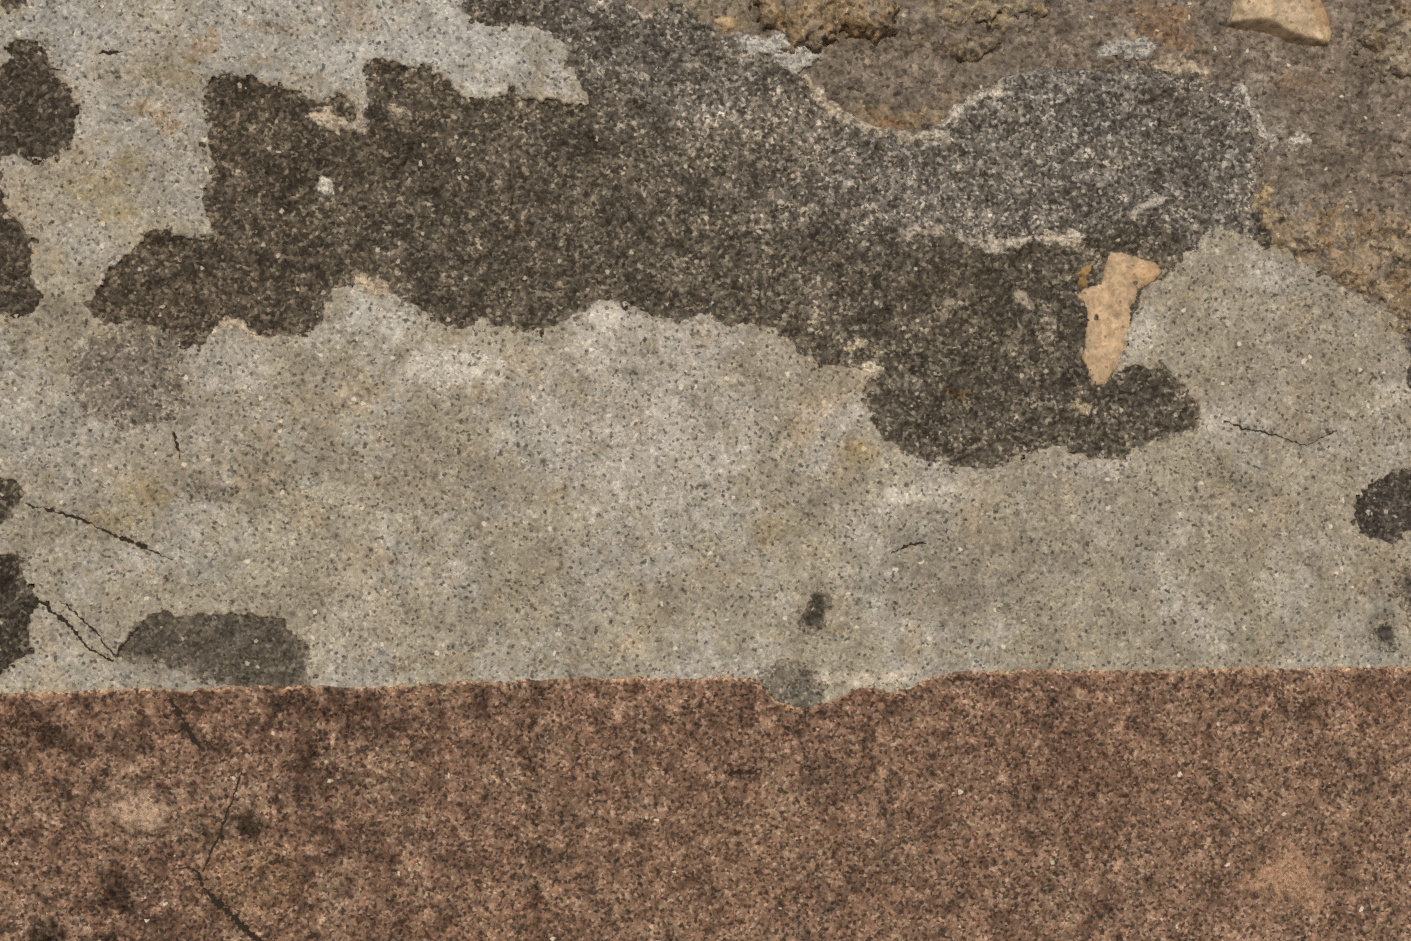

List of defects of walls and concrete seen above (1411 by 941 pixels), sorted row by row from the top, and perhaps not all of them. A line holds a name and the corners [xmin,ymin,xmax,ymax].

spalling [0,40,81,322]
spalling [65,0,1411,472]
spalling [1351,469,1411,544]
spalling [0,554,50,675]
spalling [113,609,318,687]
spalling [1368,566,1411,652]
crack [168,698,263,941]